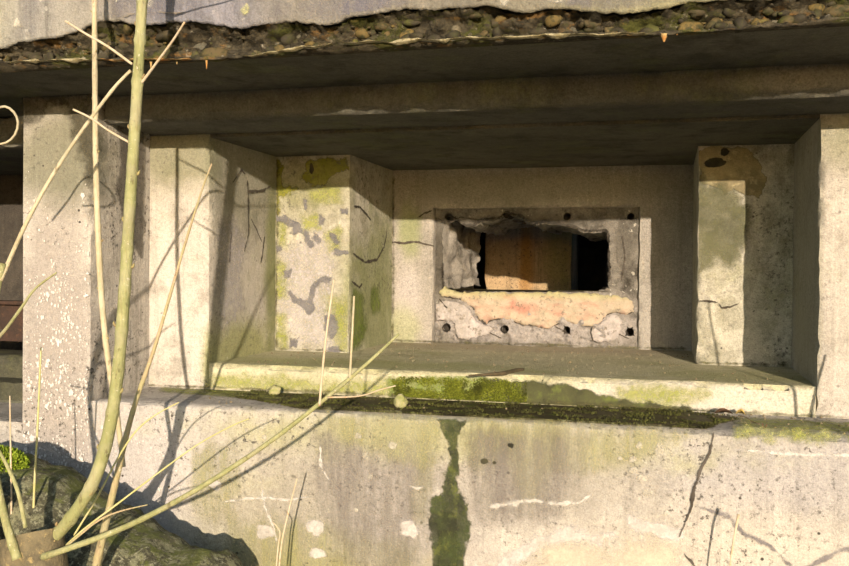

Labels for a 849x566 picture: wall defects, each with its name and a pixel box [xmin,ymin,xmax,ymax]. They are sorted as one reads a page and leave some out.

spalling [0,21,135,73]
spalling [144,0,849,69]
crack [229,169,271,262]
damp [310,187,339,203]
damp [698,175,751,269]
flaking render [435,211,634,342]
damp [162,373,849,566]
crack [679,432,849,566]